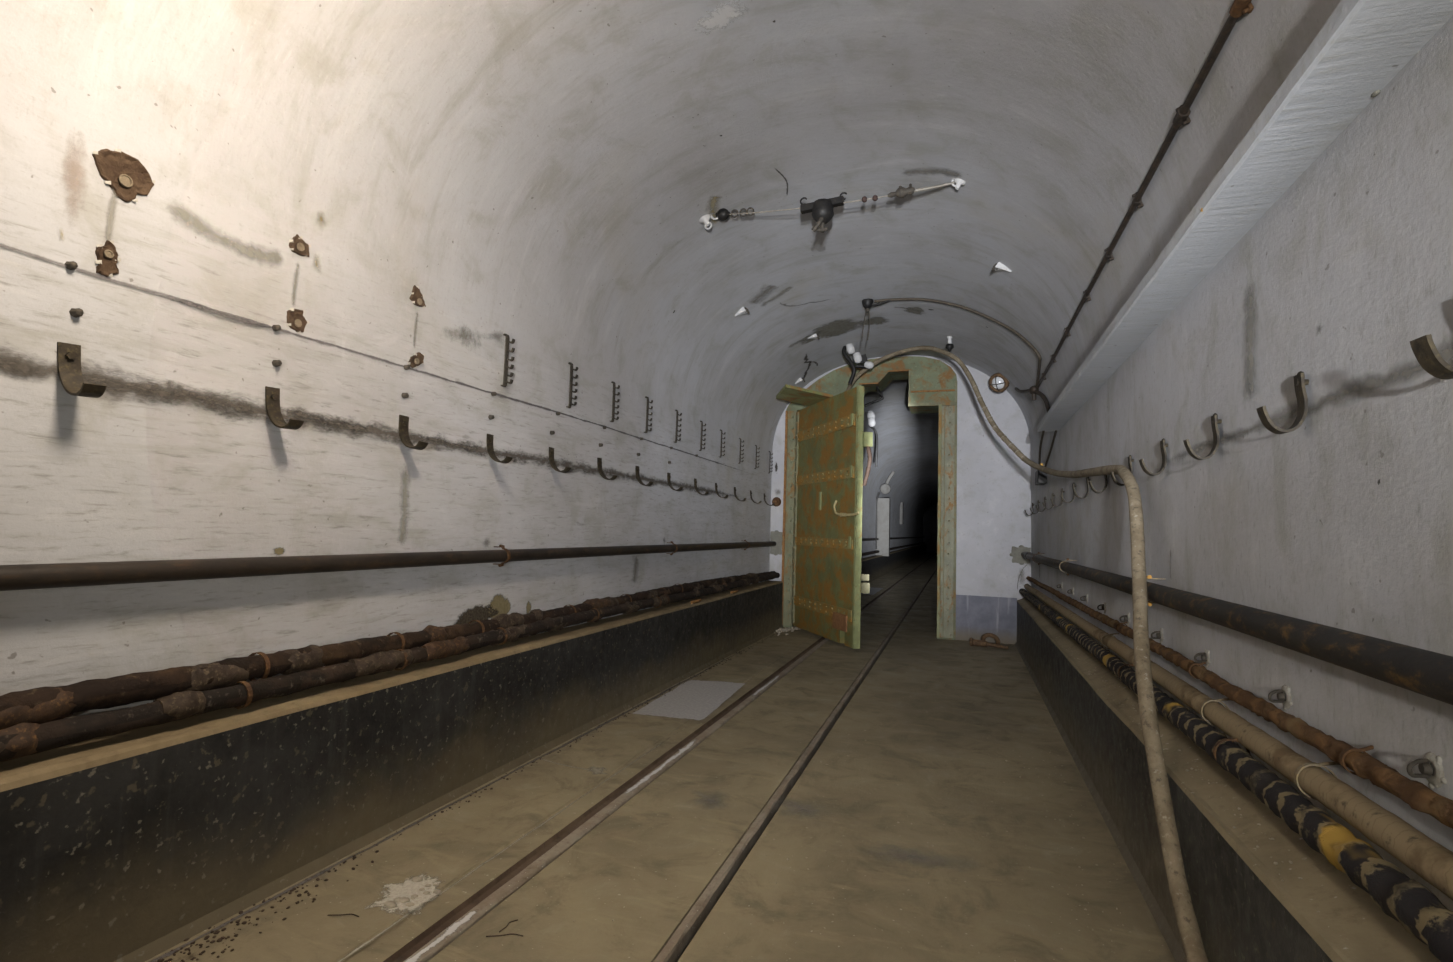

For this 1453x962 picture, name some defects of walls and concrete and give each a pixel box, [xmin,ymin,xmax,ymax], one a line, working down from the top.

damp [107,193,116,240]
damp [174,208,318,304]
damp [0,244,736,469]
damp [400,472,408,542]